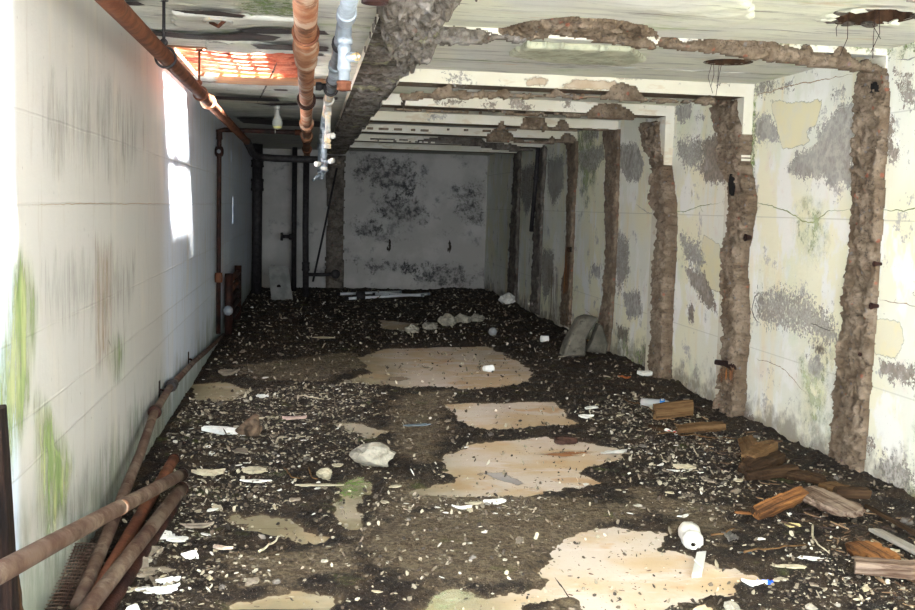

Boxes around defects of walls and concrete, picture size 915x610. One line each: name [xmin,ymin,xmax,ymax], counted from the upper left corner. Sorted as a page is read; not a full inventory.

spalling [821,0,915,28]
water stain [354,156,429,242]
crack [759,203,844,223]
water stain [354,259,473,286]
spalling [367,34,915,496]